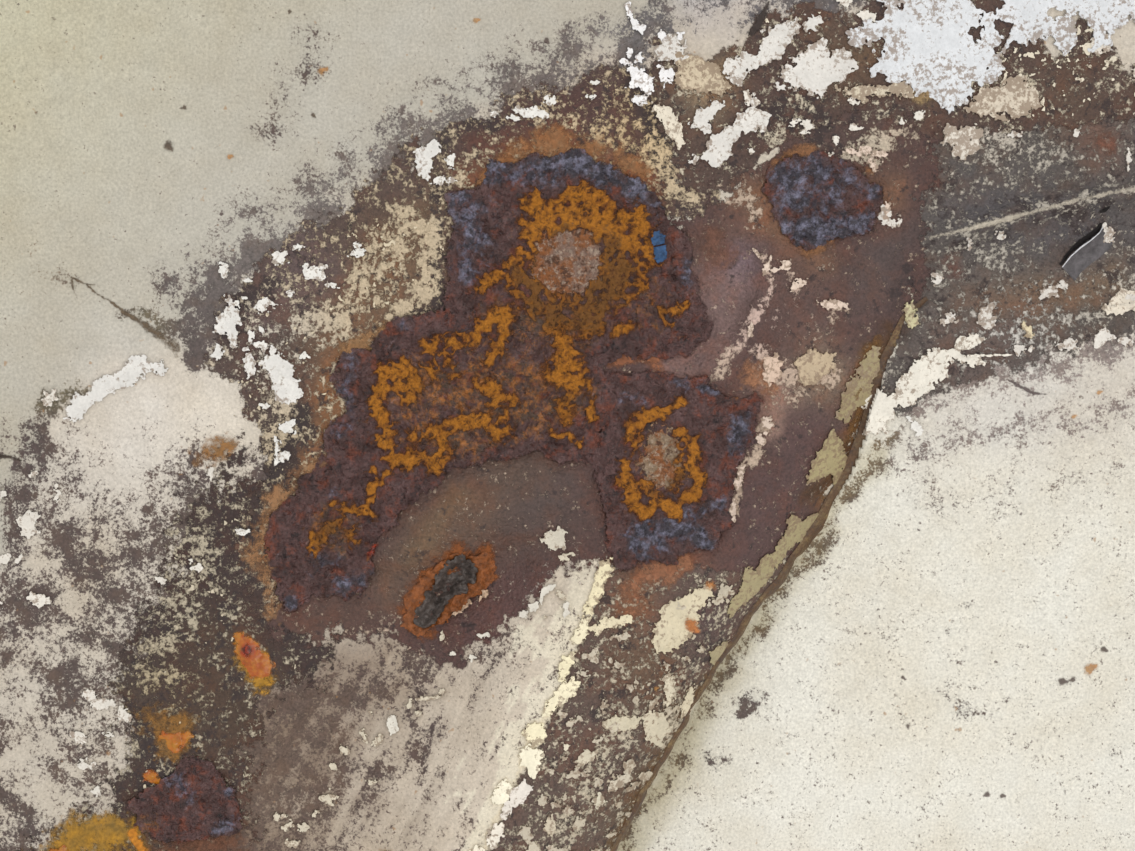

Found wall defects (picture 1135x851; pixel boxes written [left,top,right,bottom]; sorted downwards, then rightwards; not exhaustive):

peeling [656,64,675,89]
peeling [217,261,229,279]
corrosion [761,143,884,257]
peeling [878,203,902,228]
crack [1059,206,1115,281]
corrosion [244,123,778,620]
peeling [906,416,924,438]
corrosion [685,618,700,633]
corrosion [233,631,276,695]
corrosion [40,706,243,851]